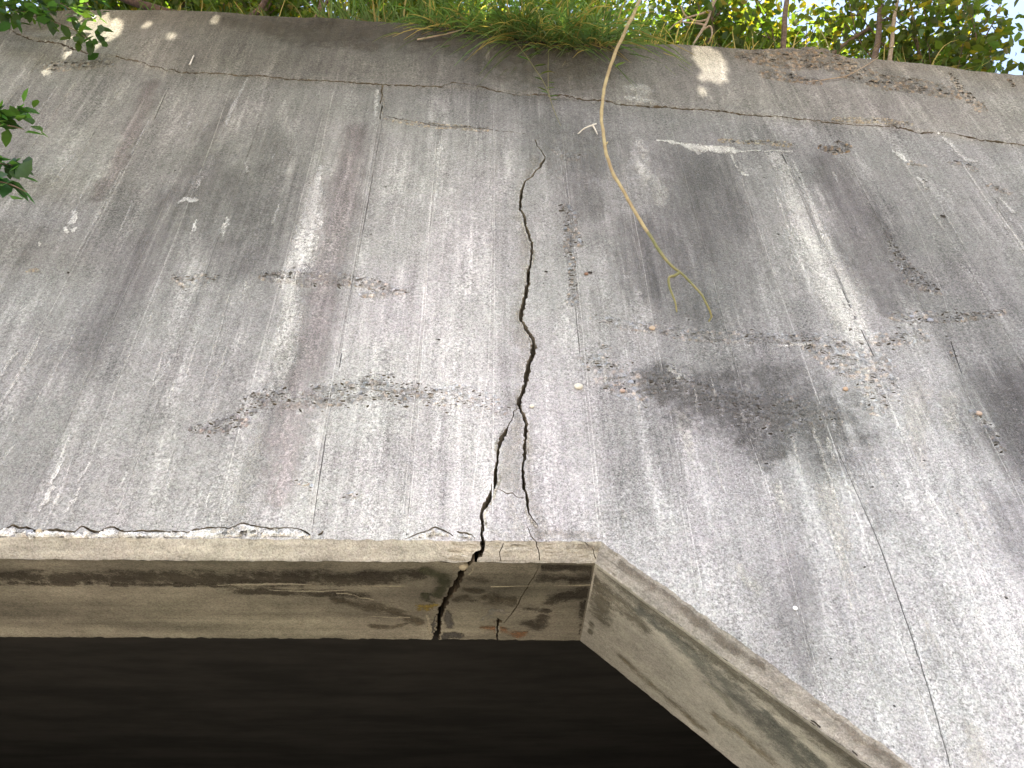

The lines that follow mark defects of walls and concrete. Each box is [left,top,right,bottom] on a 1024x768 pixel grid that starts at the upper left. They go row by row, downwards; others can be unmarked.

crack [8,29,88,54]
crack [115,56,1024,640]
damp [638,361,876,469]
spalling [0,524,312,539]